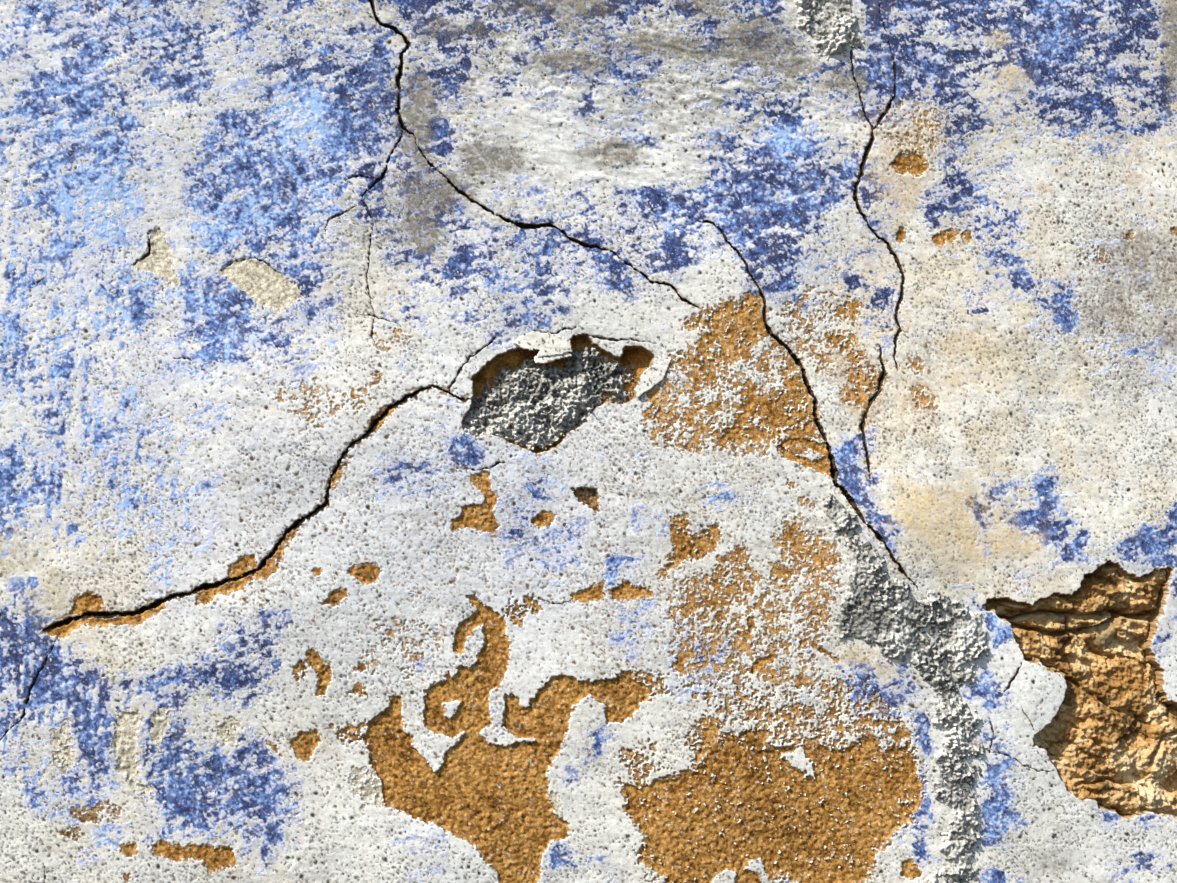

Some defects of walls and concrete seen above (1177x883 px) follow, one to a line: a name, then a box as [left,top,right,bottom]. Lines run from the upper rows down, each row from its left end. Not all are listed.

crack [325,0,701,331]
peeling [0,0,1177,599]
crack [699,4,918,589]
peeling [0,575,332,876]
crack [4,339,494,735]
peeling [321,478,942,883]
peeling [980,864,1028,883]
spalling [947,455,1177,851]
peeling [1106,847,1173,883]